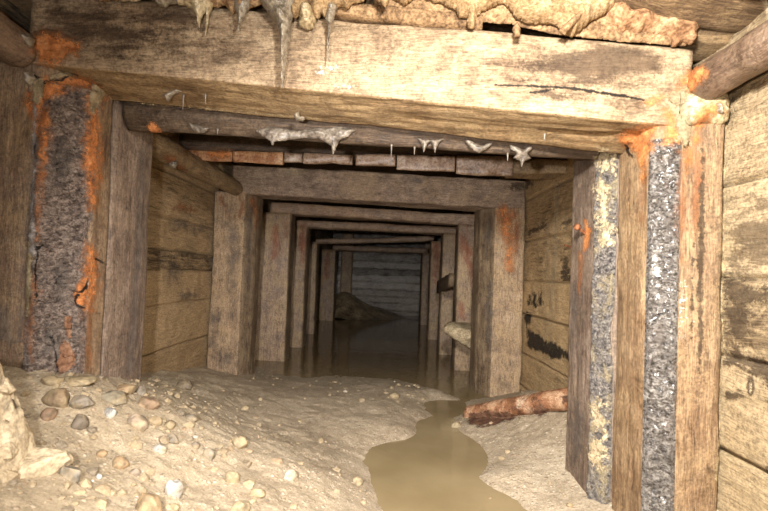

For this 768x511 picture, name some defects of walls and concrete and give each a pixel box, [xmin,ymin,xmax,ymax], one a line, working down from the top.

corrosion [35,31,80,66]
water stain [34,3,192,57]
crack [495,84,644,101]
corrosion [681,66,708,91]
corrosion [23,76,104,210]
corrosion [618,109,681,180]
corrosion [680,102,725,228]
corrosion [83,242,97,332]
corrosion [578,219,591,294]
water stain [524,292,569,360]
water stain [720,272,768,389]
water stain [725,389,744,400]